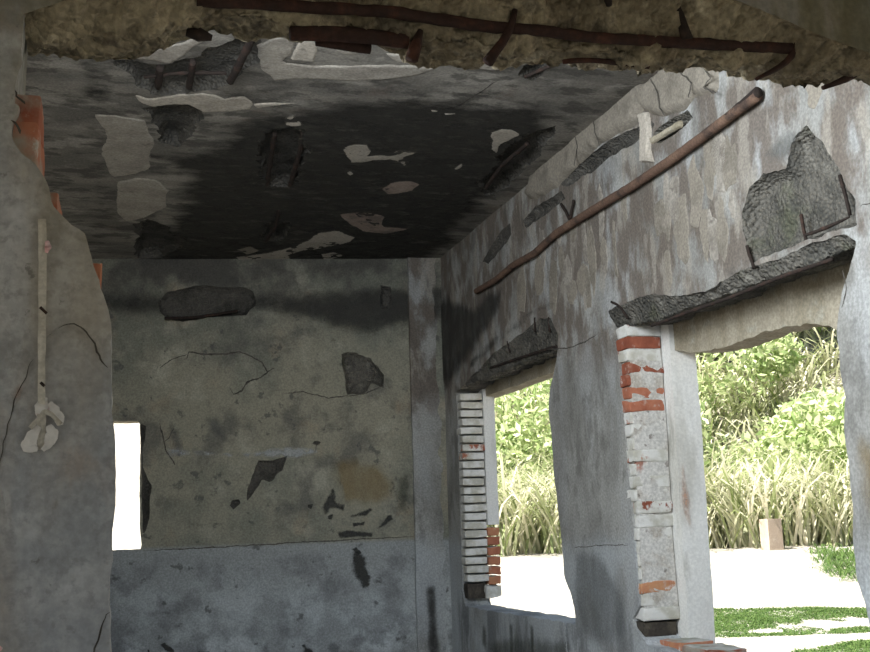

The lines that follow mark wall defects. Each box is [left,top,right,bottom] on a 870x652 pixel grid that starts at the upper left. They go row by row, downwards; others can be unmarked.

spalling [25,0,870,264]
spalling [608,126,857,328]
spalling [159,285,256,322]
crack [50,323,108,368]
spalling [341,352,384,395]
crack [0,360,33,461]
peeling [0,324,116,579]
spalling [141,424,152,533]
spalling [230,456,287,510]
crack [146,537,400,551]
crack [93,612,110,652]